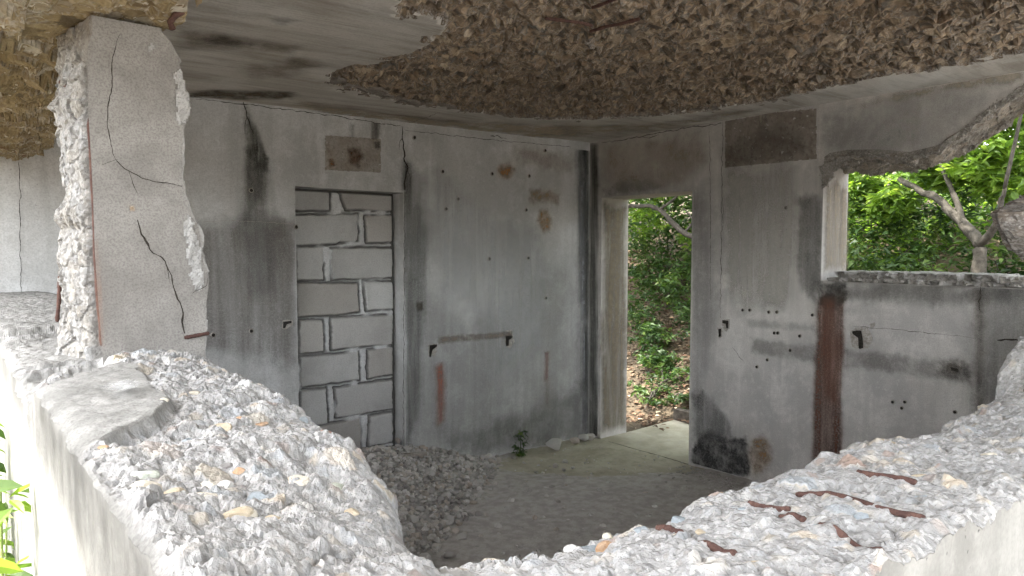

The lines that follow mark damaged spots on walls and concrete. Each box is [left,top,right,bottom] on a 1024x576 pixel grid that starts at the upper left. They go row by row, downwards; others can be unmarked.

crack [107,34,182,192]
spalling [173,69,191,125]
water stain [248,118,267,185]
spalling [325,0,1024,122]
spalling [819,84,1024,190]
spalling [87,118,102,346]
crack [137,220,208,334]
spalling [183,215,204,291]
water stain [203,233,226,348]
corrosion [813,292,844,460]